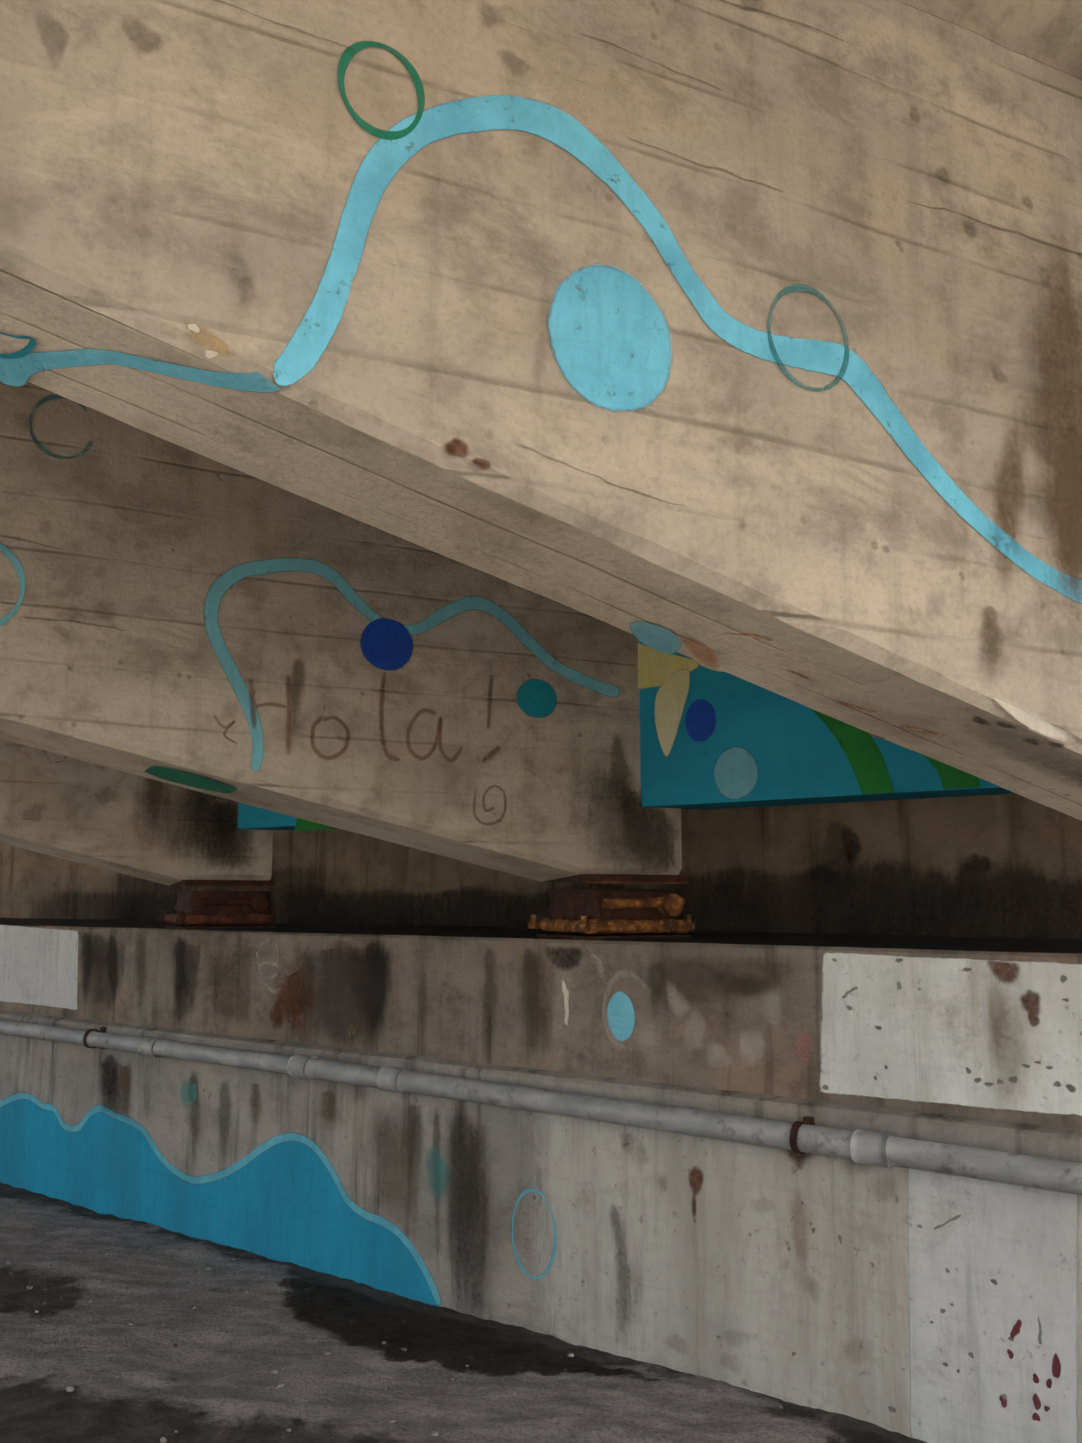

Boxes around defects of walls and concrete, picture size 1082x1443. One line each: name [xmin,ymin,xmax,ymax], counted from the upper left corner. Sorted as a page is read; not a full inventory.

leakage [1035,269,1082,583]
leakage [998,440,1023,562]
leakage [48,872,549,1007]
corrosion [271,970,310,1028]
corrosion [989,961,1018,982]
corrosion [1021,991,1039,1026]
corrosion [689,1168,703,1217]